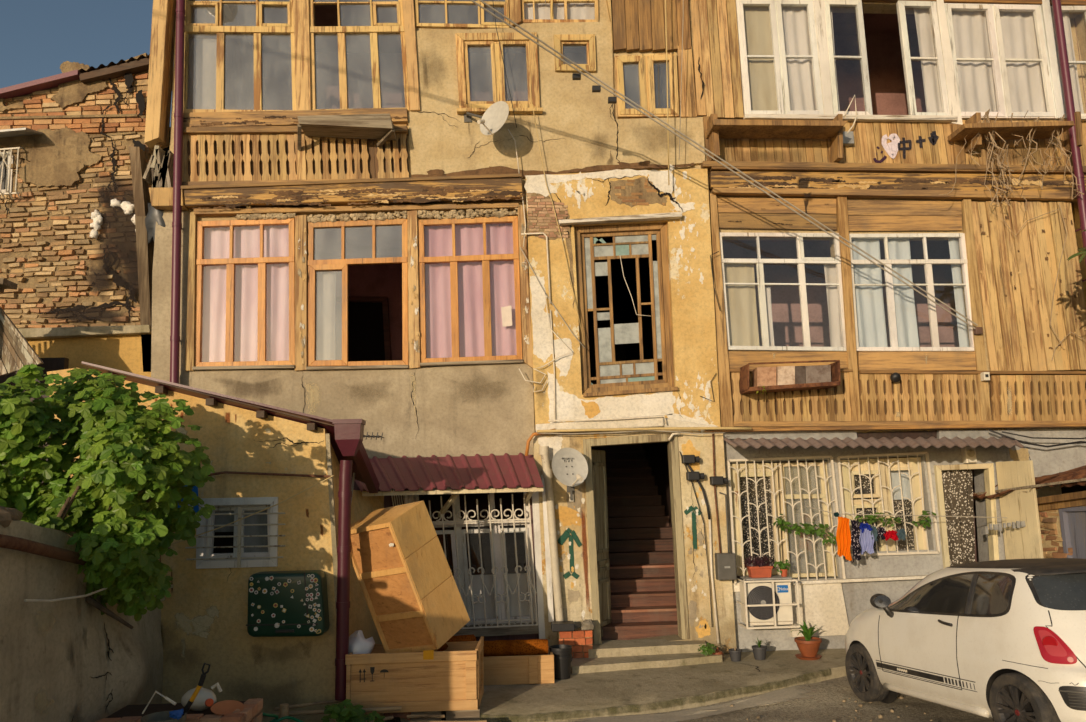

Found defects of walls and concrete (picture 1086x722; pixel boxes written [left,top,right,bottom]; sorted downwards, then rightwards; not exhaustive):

water stain [98,186,108,206]
crack [100,77,134,187]
water stain [122,253,139,292]
spalling [124,73,145,116]
peeling [192,161,704,308]
crack [587,104,683,212]
crack [254,437,323,448]
peeling [521,262,716,638]